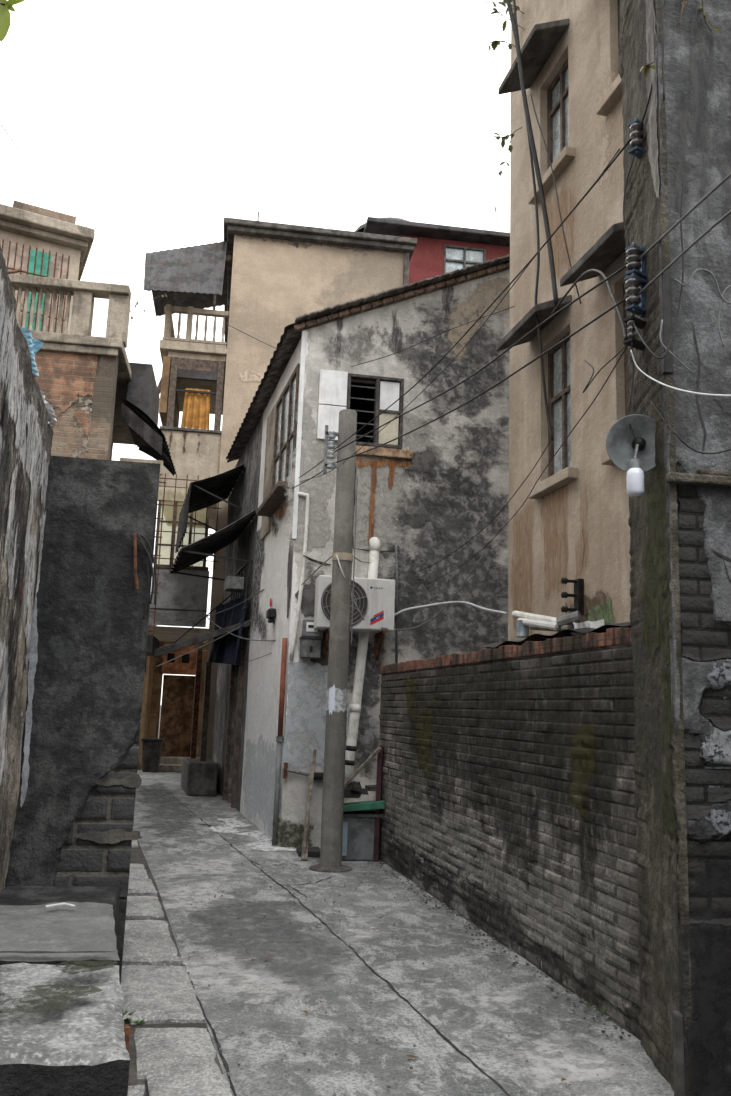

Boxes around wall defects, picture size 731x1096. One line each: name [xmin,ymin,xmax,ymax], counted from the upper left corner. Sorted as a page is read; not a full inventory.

water stain [0,389,28,725]
peeling [0,269,98,847]
corrosion [355,457,411,543]
water stain [348,285,587,777]
spalling [676,462,731,926]
crack [165,789,510,1096]